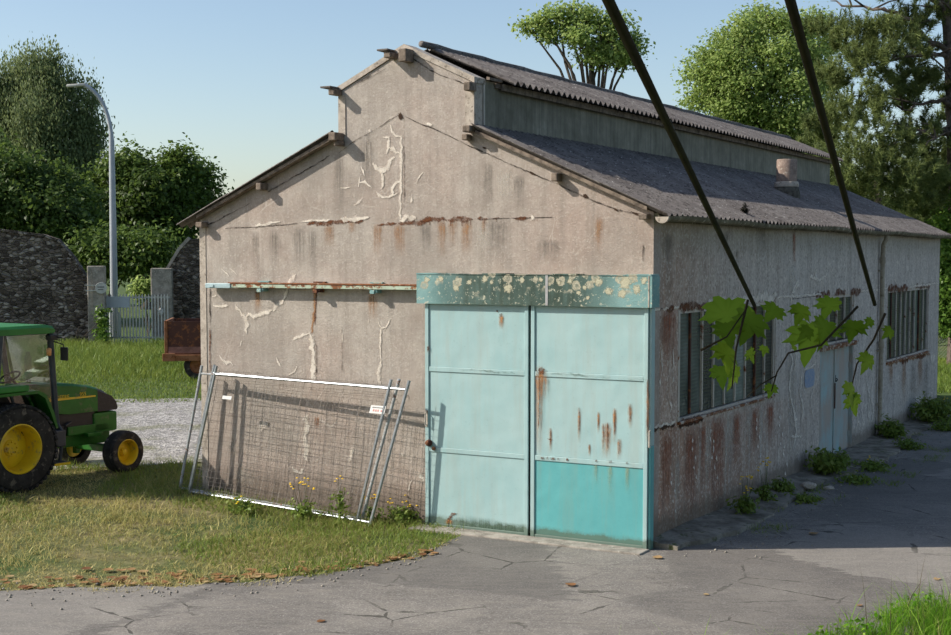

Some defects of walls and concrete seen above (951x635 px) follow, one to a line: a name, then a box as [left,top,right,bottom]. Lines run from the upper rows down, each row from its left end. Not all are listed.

rust [307,220,363,230]
rust [376,215,552,240]
rust [816,288,861,298]
rust [655,301,706,344]
rust [536,367,546,426]
rust [597,409,620,462]
rust [679,414,723,482]